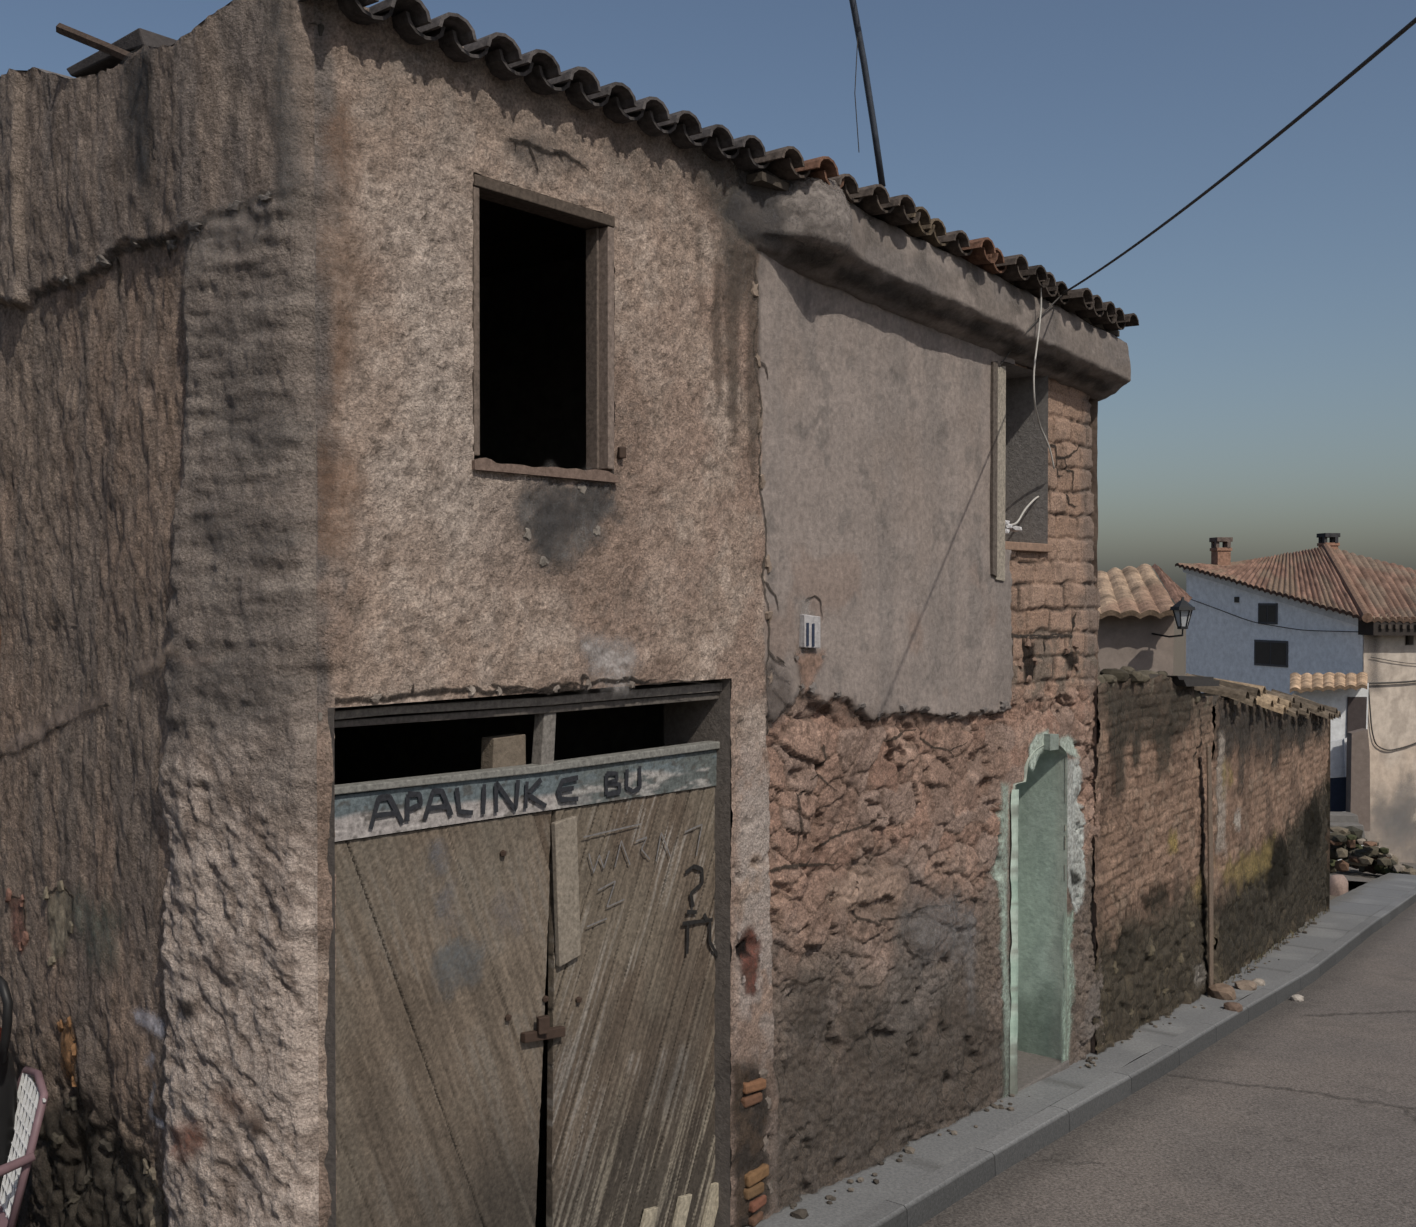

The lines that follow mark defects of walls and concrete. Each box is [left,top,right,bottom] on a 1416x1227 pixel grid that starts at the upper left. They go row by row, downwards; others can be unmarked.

damp [125,51,150,179]
crack [509,138,590,174]
damp [519,477,615,567]
flaking render [766,649,1009,726]
spalling [5,888,29,952]
hole [735,927,763,994]
flaking render [826,870,903,909]
peeling [993,786,1010,1098]
peeling [1029,731,1086,1061]
damp [1213,786,1329,964]